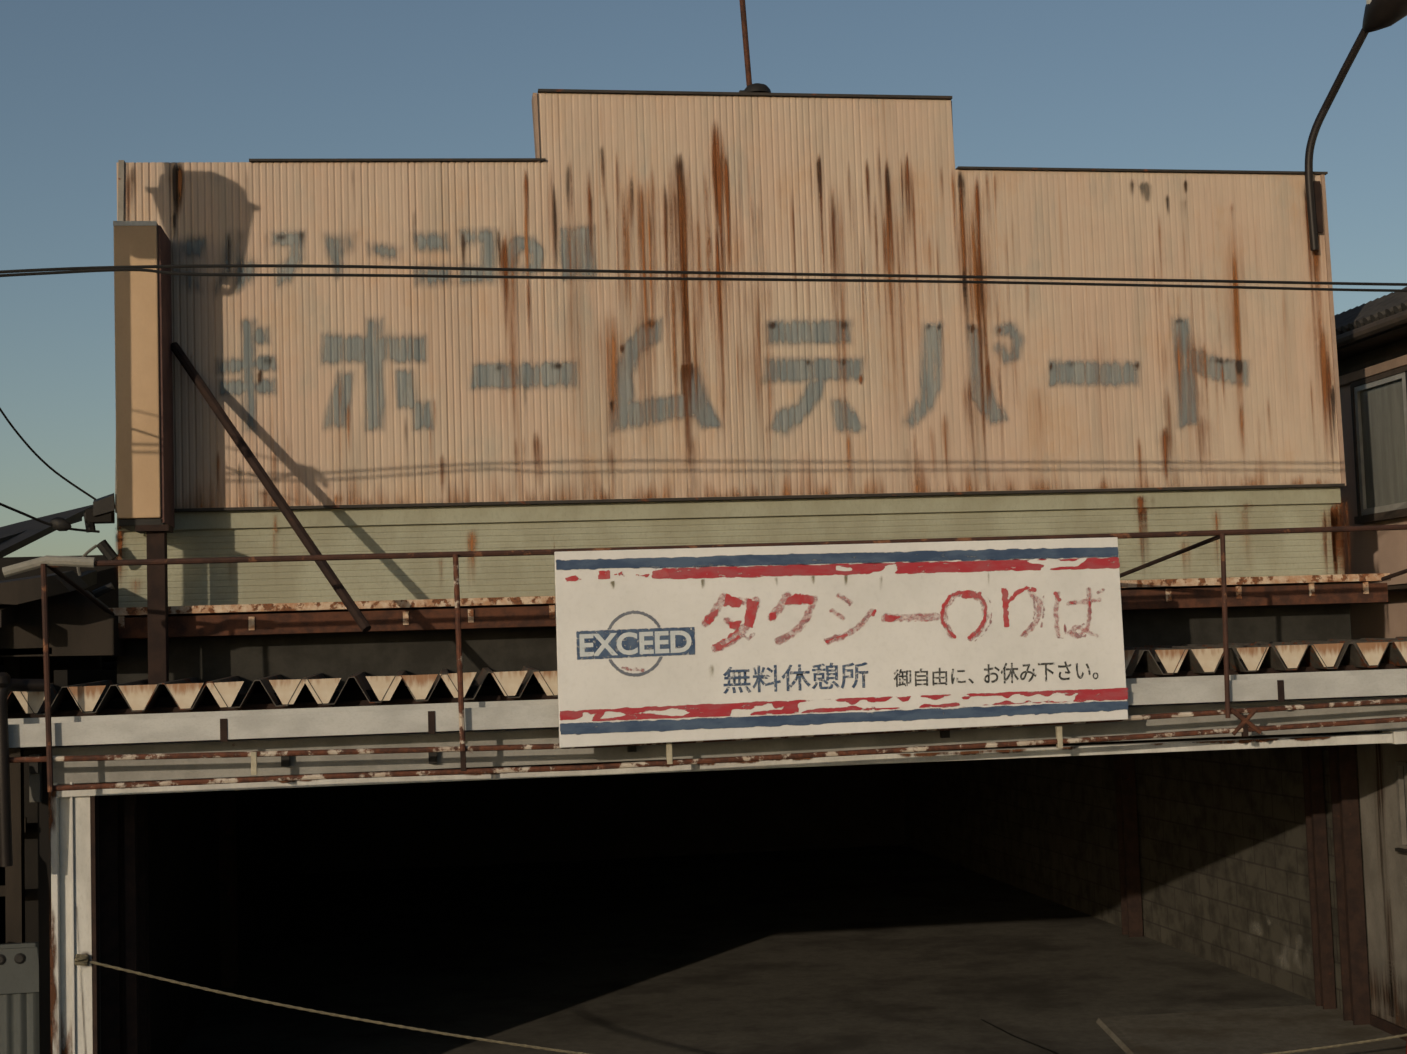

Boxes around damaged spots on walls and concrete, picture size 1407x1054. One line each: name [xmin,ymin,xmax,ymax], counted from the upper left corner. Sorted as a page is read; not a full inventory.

rust [172,165,182,234]
rust [498,174,529,304]
rust [553,127,730,422]
rust [817,158,835,269]
rust [875,158,917,330]
rust [952,173,1001,403]
rust [1163,259,1242,474]
rust [1196,736,1331,744]
rust [50,916,86,1054]